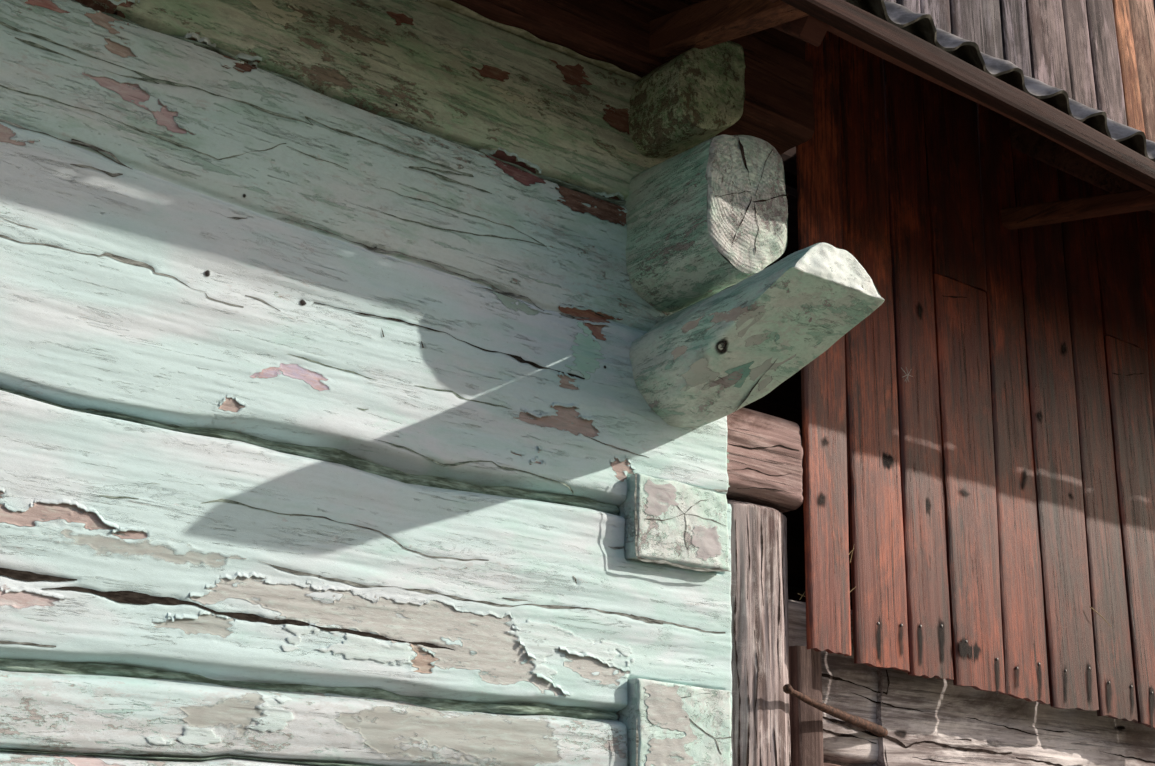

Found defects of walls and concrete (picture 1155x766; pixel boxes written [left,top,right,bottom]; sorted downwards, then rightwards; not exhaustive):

crack [0,21,545,246]
peeling [480,147,627,226]
crack [716,134,788,251]
crack [0,217,280,311]
crack [285,218,614,319]
peeling [513,371,600,437]
crack [0,567,454,650]
peeling [0,486,635,696]
peeling [42,755,124,766]
peeling [146,690,294,745]
peeling [334,706,562,766]
crack [823,716,1076,766]